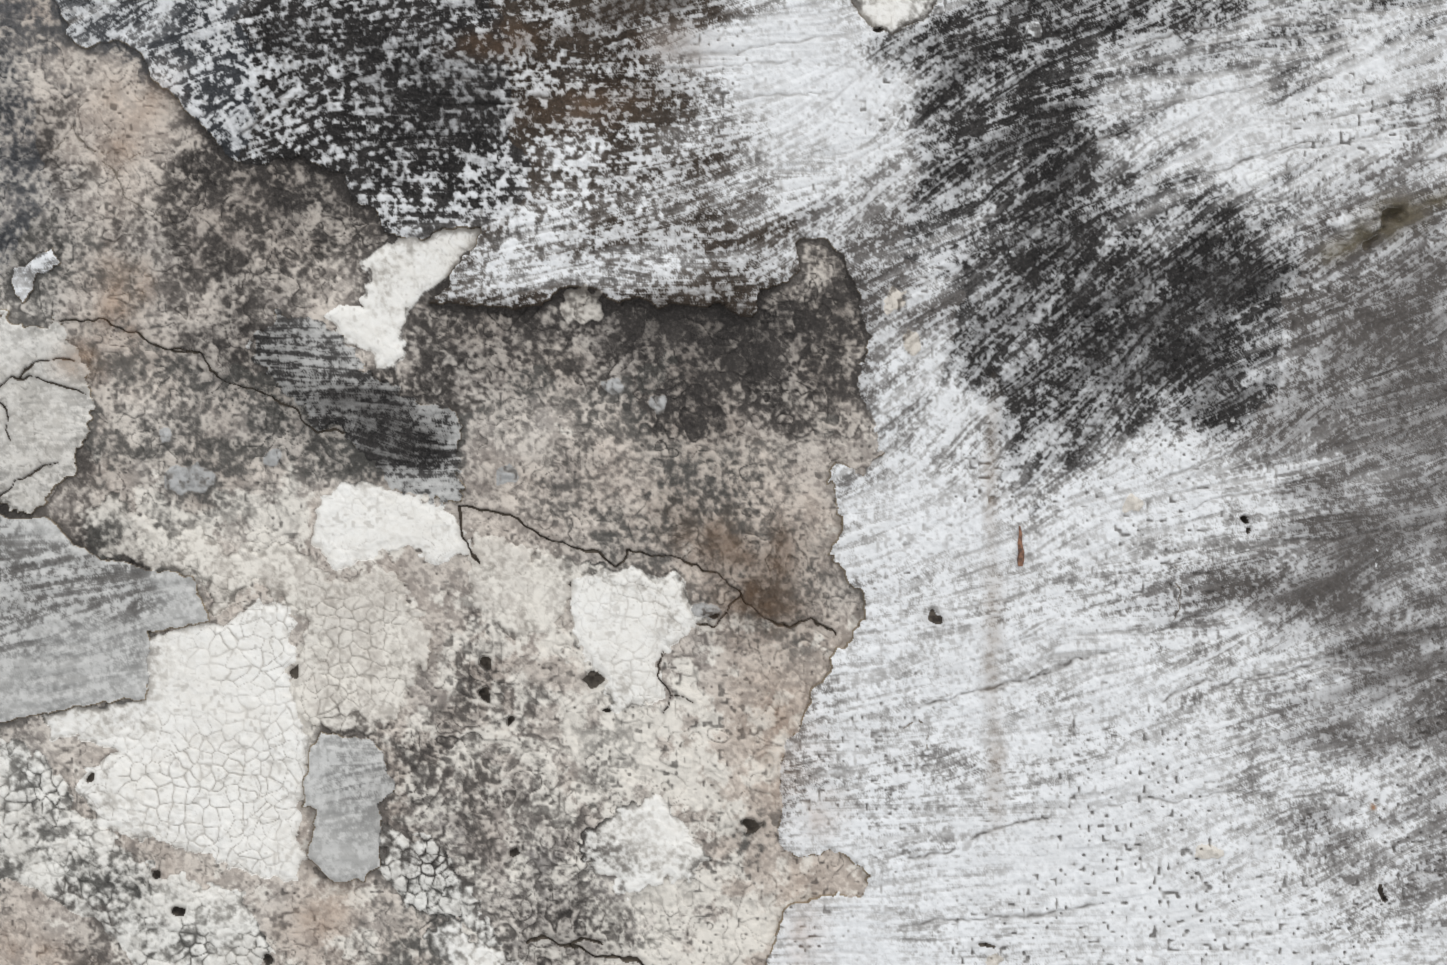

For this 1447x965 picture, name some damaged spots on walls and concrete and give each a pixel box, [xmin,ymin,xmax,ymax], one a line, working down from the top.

flaking render [851,0,938,34]
spalling [884,286,907,315]
crack [0,358,86,441]
crack [60,318,347,434]
crack [0,463,56,497]
flaking render [0,0,885,965]
spalling [928,609,943,624]
crack [378,822,644,965]